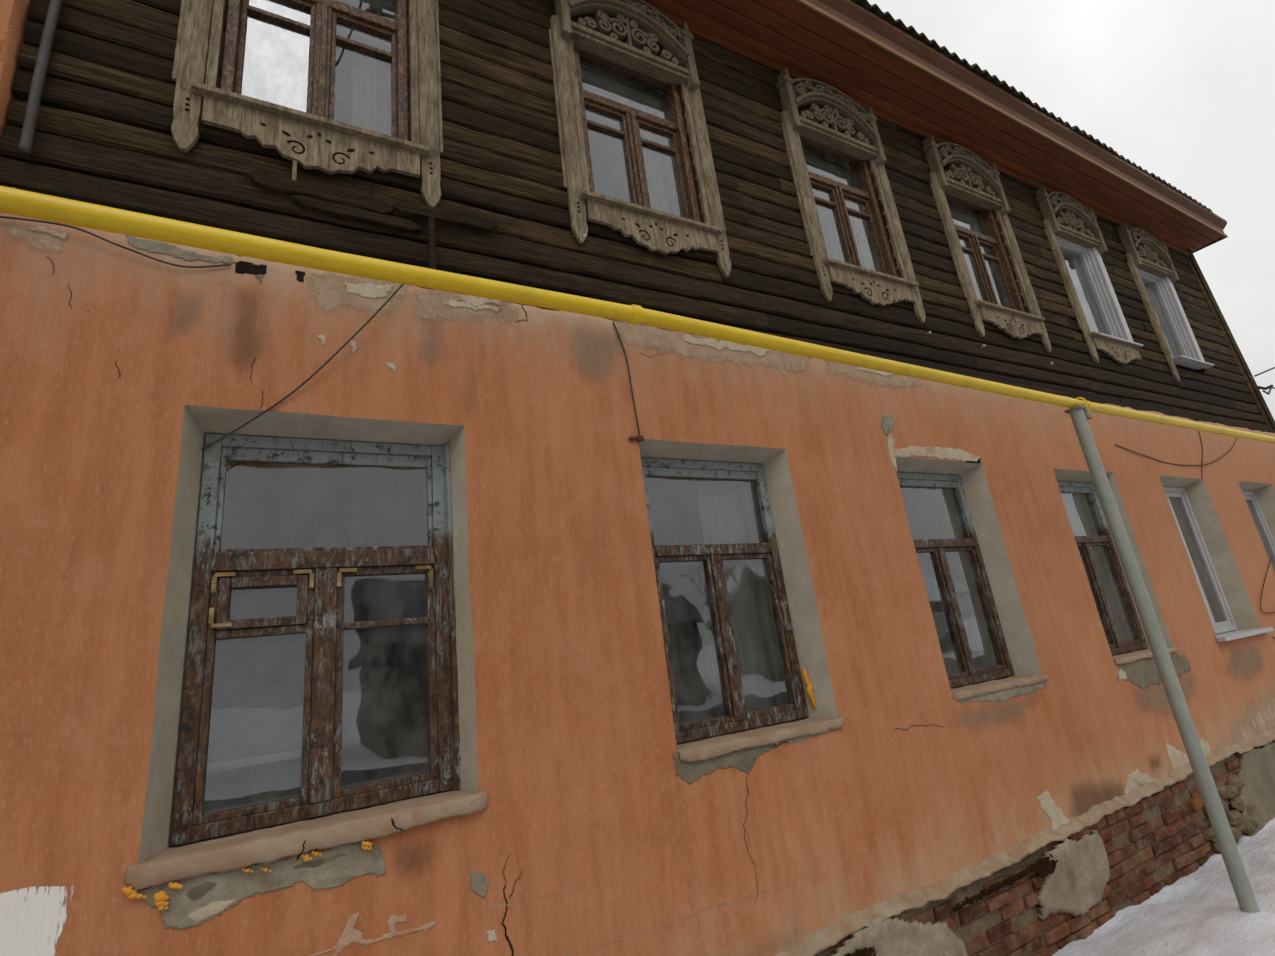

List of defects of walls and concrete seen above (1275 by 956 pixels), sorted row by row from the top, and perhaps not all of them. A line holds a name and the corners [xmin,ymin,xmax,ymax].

peeling [295,270,518,323]
peeling [616,320,811,375]
peeling [826,361,921,389]
spalling [881,414,981,472]
spalling [1117,658,1162,689]
spalling [1170,653,1191,677]
spalling [673,727,841,785]
flaking render [1200,738,1240,817]
flaking render [904,743,1216,956]
spalling [139,842,385,930]
spalling [310,911,435,956]
crack [502,856,522,956]